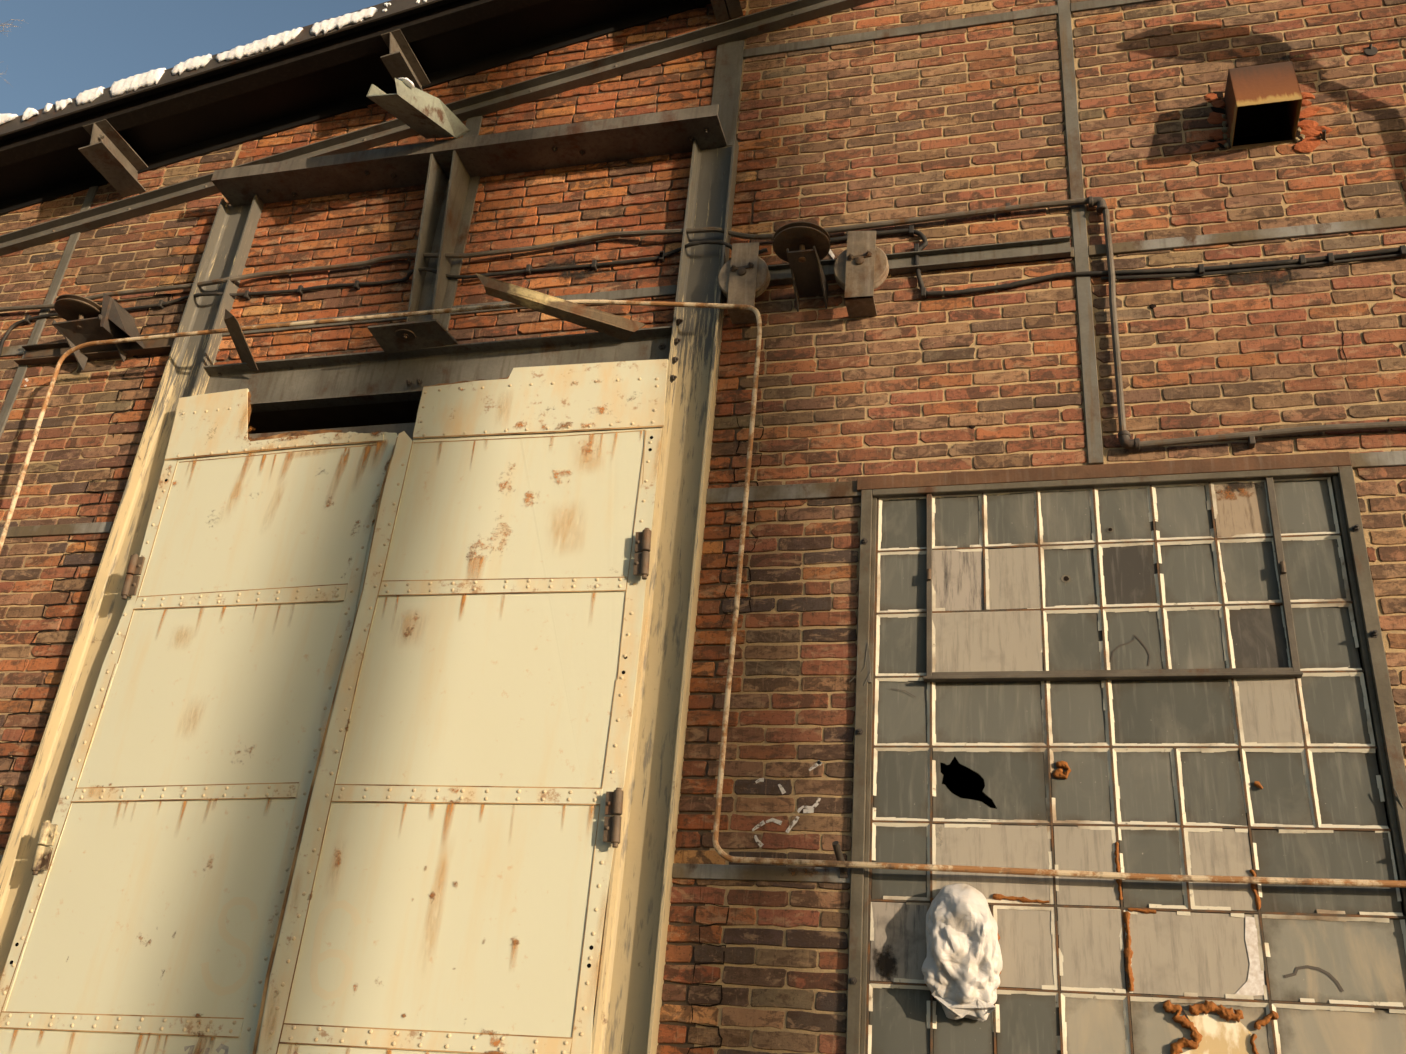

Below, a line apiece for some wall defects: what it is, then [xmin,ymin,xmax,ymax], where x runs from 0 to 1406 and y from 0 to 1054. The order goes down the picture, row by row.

peeling [1292,92,1333,153]
rust [335,431,390,474]
rust [481,1030,503,1054]